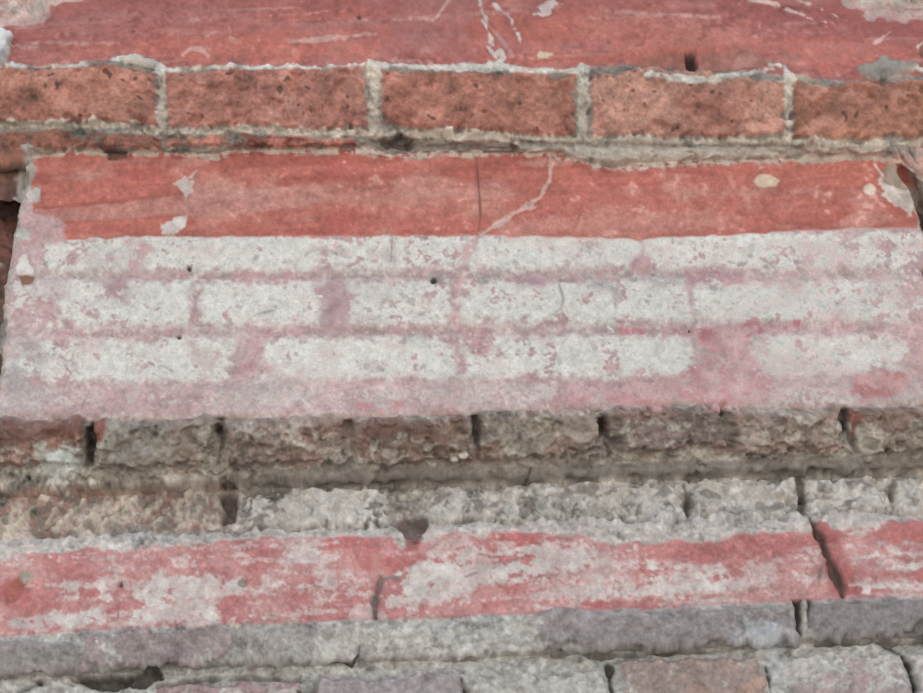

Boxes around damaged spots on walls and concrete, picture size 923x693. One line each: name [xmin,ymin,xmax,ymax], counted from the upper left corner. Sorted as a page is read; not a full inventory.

spalling [0,27,15,66]
peeling [476,0,526,63]
spalling [626,47,781,73]
peeling [862,163,921,229]
crack [447,156,556,404]
crack [549,282,572,324]
peeling [845,366,923,438]
peeling [2,567,114,638]
peeling [122,538,345,635]
peeling [383,534,776,613]
crack [806,516,850,600]
peeling [818,509,923,596]